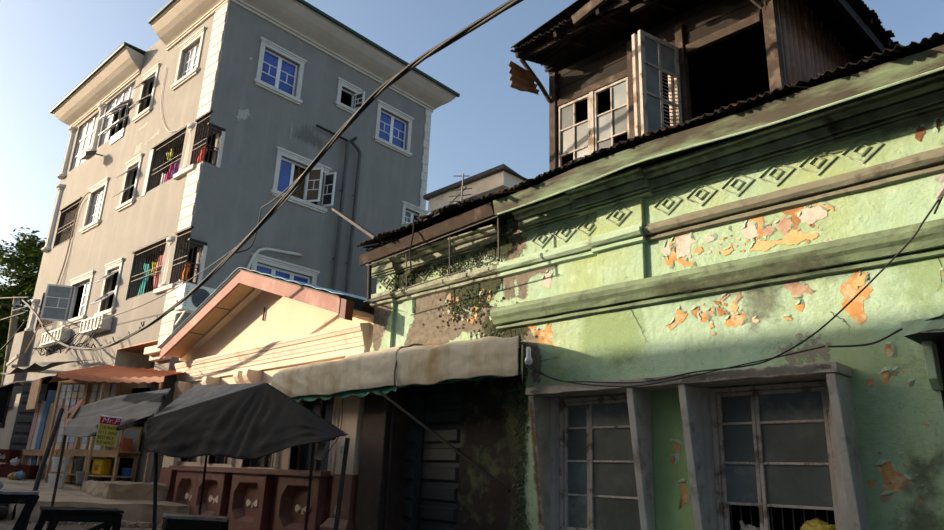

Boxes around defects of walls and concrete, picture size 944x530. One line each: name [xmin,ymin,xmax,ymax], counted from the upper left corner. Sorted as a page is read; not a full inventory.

peeling [662,201,835,269]
flaking render [372,303,395,351]
flaking render [404,265,557,347]
peeling [665,291,759,335]
peeling [840,269,873,325]
peeling [866,341,915,387]
peeling [866,447,924,527]